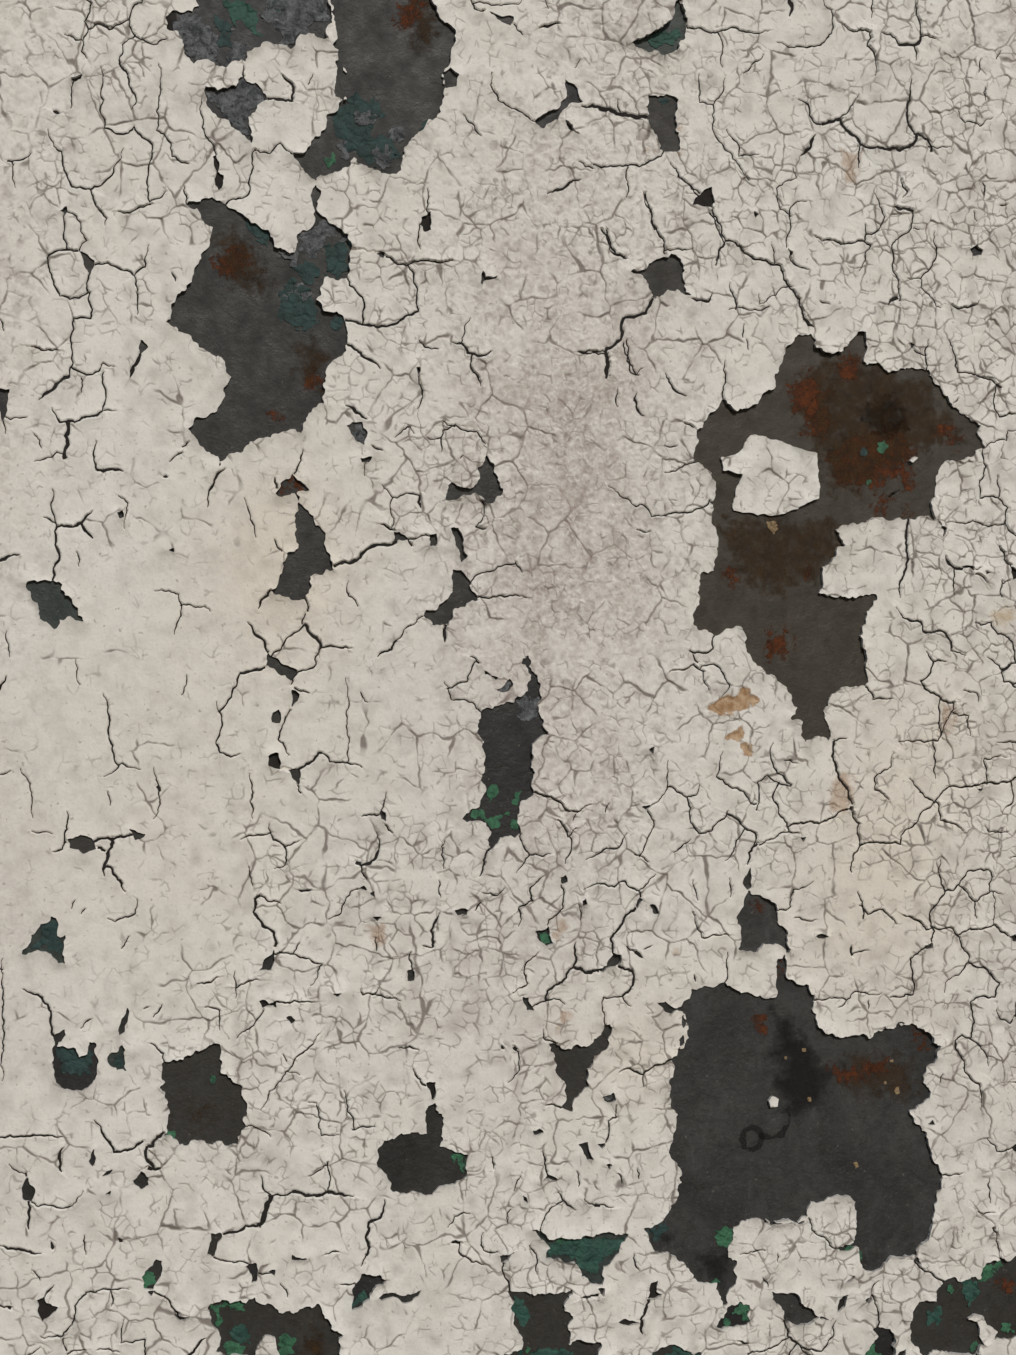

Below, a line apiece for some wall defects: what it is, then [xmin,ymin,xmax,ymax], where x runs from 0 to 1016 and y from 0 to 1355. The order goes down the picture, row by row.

crack [0,0,217,580]
peeling [166,0,458,466]
crack [197,590,481,1038]
crack [334,188,491,606]
peeling [463,656,548,849]
crack [470,0,1016,1257]
peeling [693,332,985,741]
corrosion [785,351,918,517]
peeling [160,1043,247,1145]
crack [213,1034,386,1297]
peeling [644,869,942,1328]
peeling [865,1256,1016,1355]